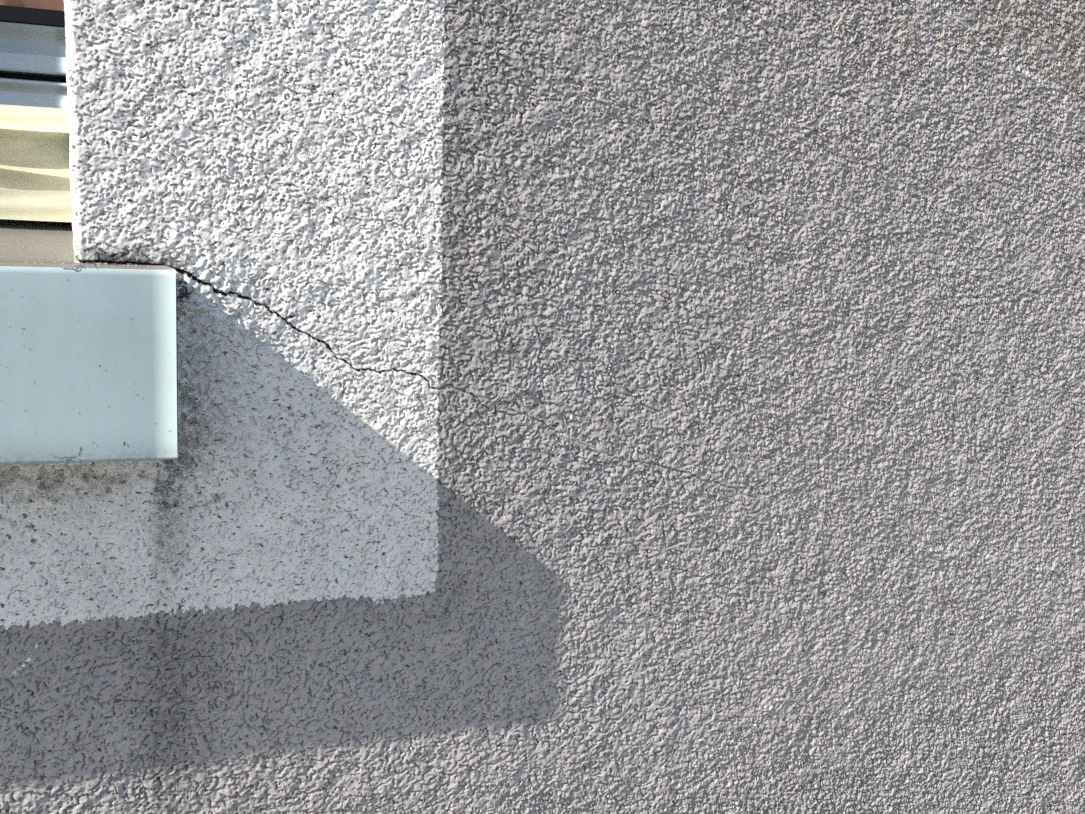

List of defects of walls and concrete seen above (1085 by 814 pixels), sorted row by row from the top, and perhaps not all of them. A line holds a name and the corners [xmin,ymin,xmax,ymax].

leakage [90,252,134,264]
crack [63,248,752,497]